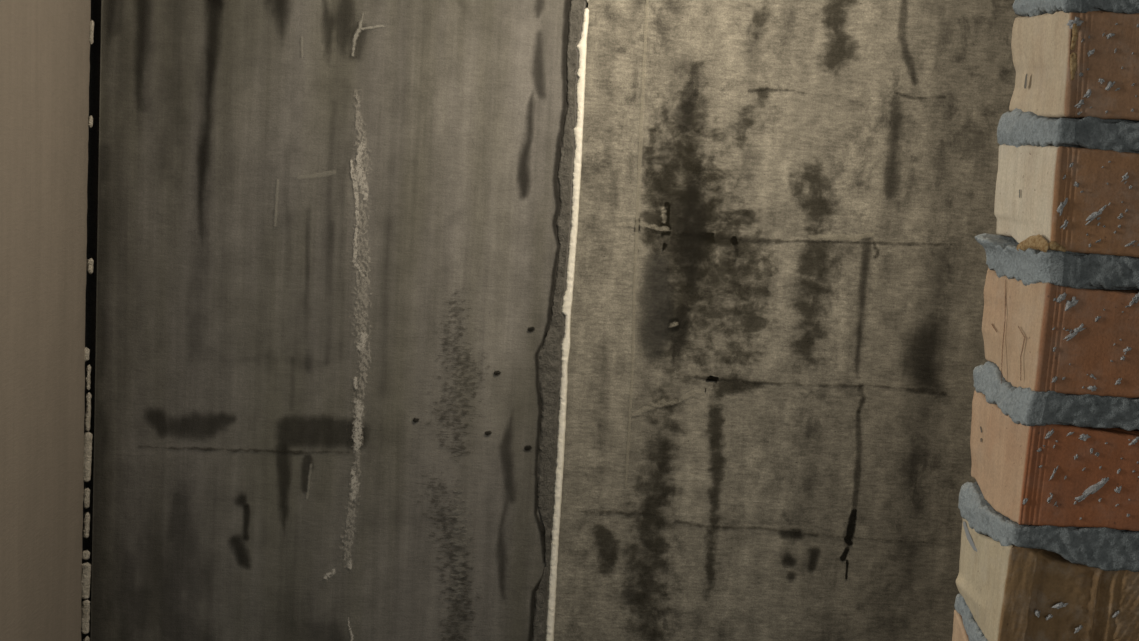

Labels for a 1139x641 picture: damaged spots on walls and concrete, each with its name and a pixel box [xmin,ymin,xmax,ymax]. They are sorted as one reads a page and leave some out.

water stain [209,0,221,95]
water stain [823,0,853,69]
water stain [644,94,769,362]
water stain [279,95,372,579]
water stain [595,440,675,640]
water stain [707,376,759,581]